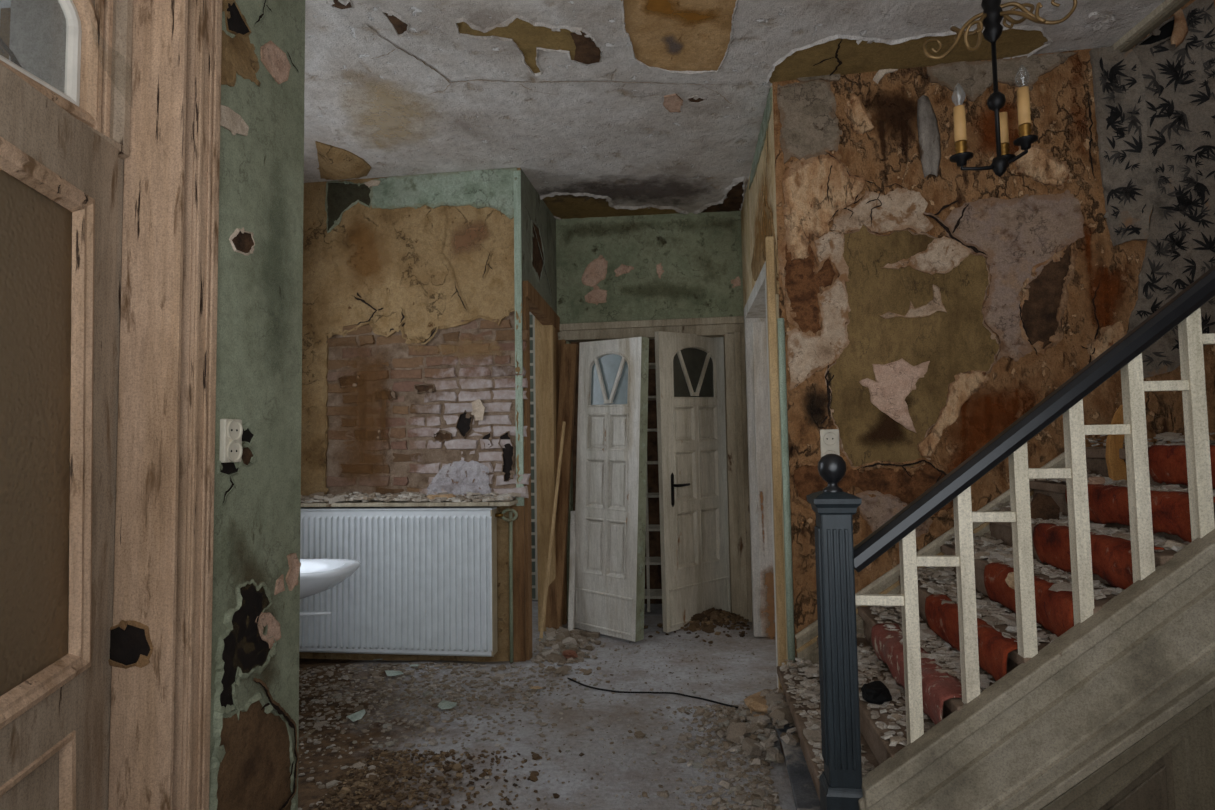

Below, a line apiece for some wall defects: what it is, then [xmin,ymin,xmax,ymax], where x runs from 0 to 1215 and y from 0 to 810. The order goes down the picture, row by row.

flaking render [221,0,291,87]
flaking render [455,14,603,75]
flaking render [620,0,739,74]
peeling [325,167,518,233]
flaking render [540,25,1053,220]
peeling [1014,144,1073,190]
crack [343,292,438,345]
crack [439,206,493,312]
flaking render [731,151,1001,514]
flaking render [1018,243,1078,354]
flaking render [322,308,531,500]
flaking render [209,553,301,810]